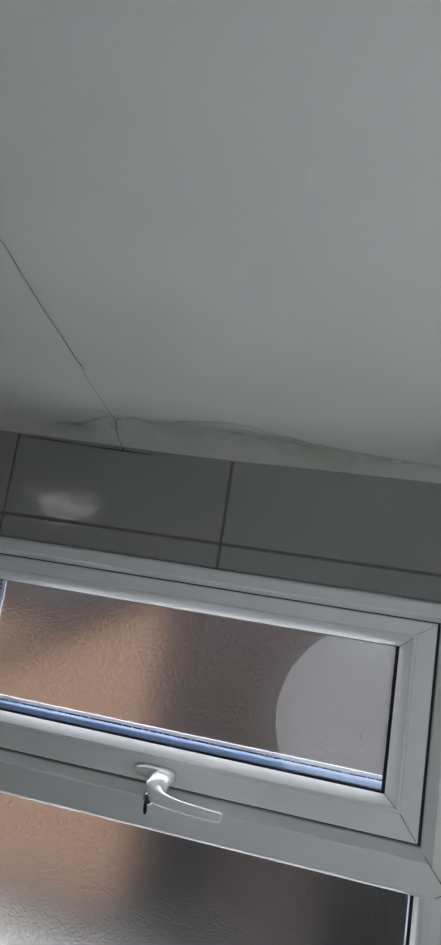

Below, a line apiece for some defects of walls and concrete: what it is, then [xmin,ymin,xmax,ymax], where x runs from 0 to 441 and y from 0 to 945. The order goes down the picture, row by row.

crack [1,241,153,455]